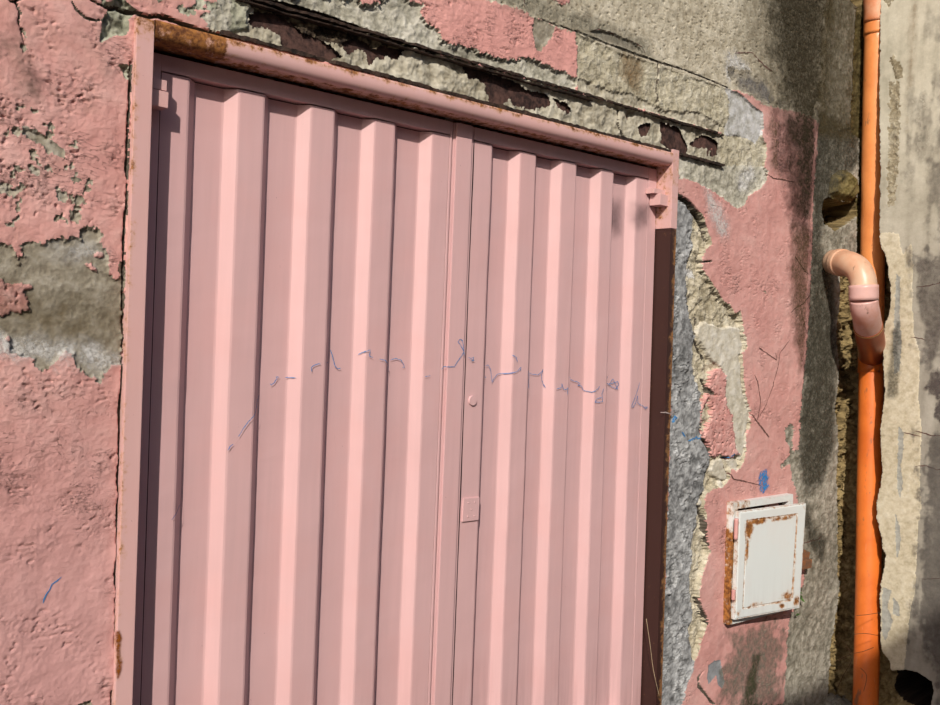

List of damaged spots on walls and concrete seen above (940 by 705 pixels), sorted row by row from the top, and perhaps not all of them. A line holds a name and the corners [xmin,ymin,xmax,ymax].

crack [8,0,22,26]
crack [71,0,231,39]
peeling [278,0,829,209]
peeling [0,121,126,384]
spalling [685,212,752,661]
crack [749,256,809,437]
leakage [726,0,863,488]
spalling [828,276,859,703]
leakage [908,259,940,362]
leakage [912,434,940,657]
leakage [925,372,940,420]
spalling [879,629,934,705]